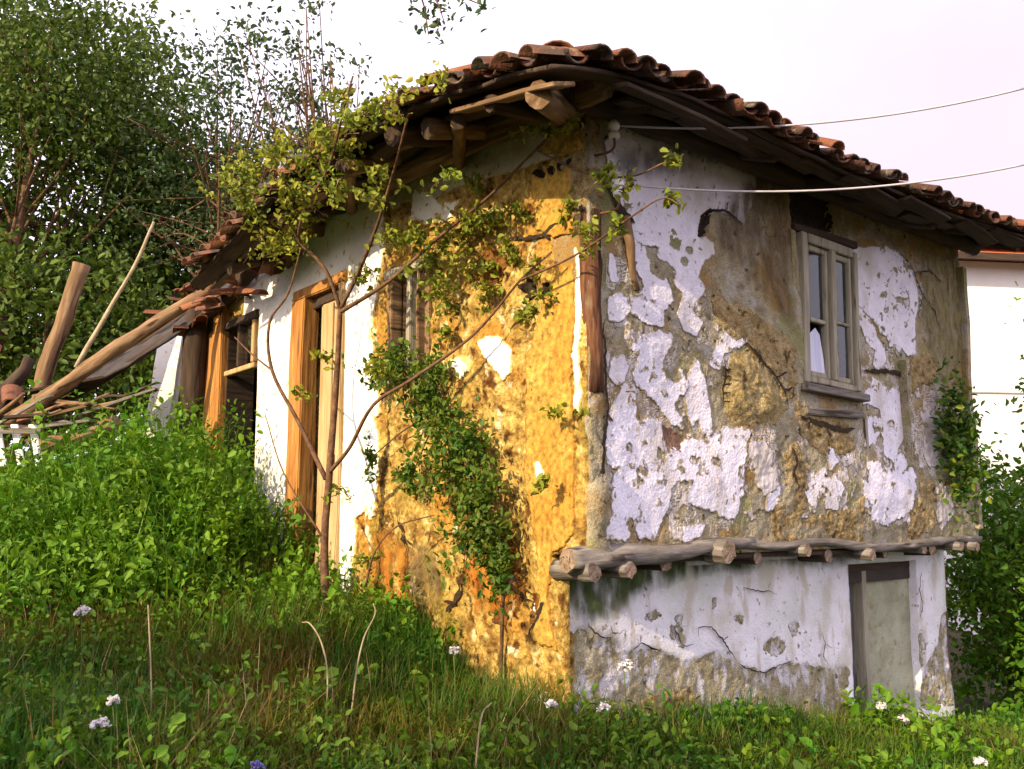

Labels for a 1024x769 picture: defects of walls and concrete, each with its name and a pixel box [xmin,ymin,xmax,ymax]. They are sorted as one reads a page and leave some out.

peeling [243,123,584,604]
peeling [477,247,850,730]
crack [588,624,792,678]
peeling [603,127,967,543]
crack [745,341,856,436]